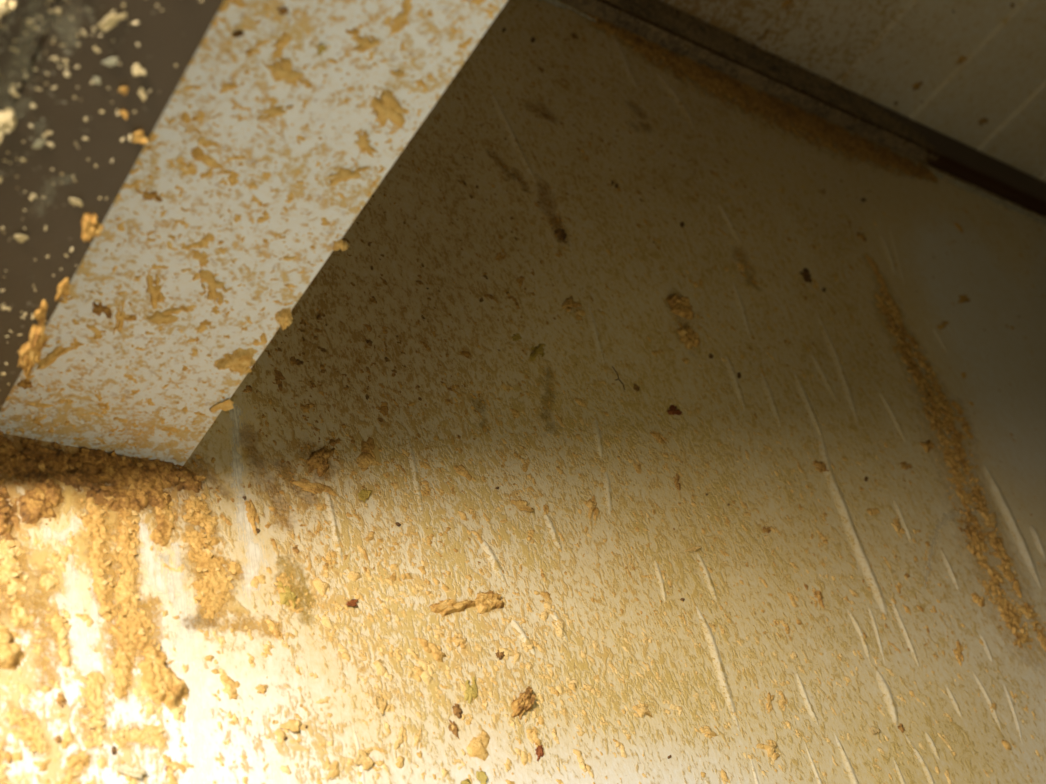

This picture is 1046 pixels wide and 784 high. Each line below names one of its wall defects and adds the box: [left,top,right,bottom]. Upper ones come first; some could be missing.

peeling [98,450,143,587]